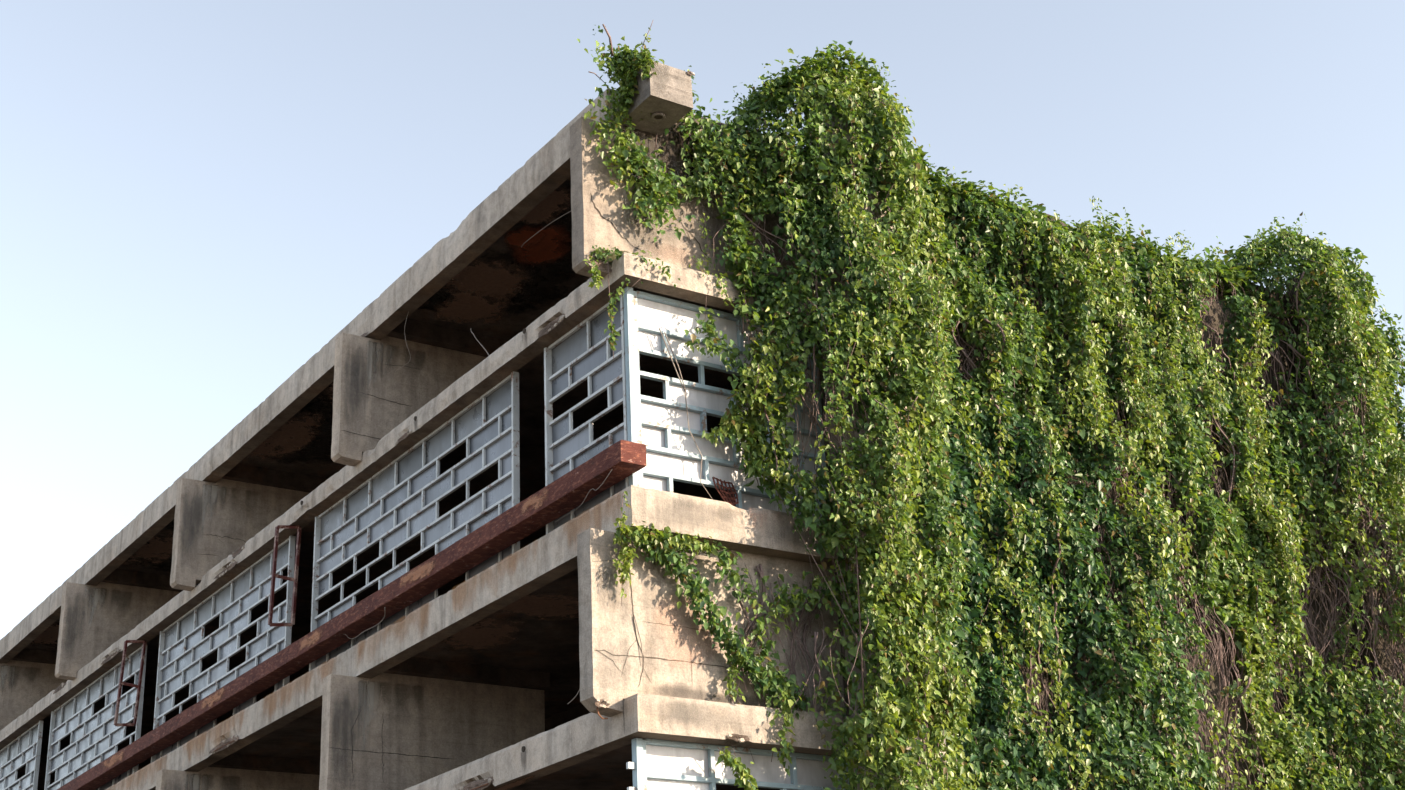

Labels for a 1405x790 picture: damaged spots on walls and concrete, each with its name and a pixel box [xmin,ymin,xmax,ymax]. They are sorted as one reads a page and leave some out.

crack [591,194,645,254]
damp [419,187,574,317]
corrosion [522,493,546,512]
corrosion [400,563,432,585]
corrosion [300,631,320,649]